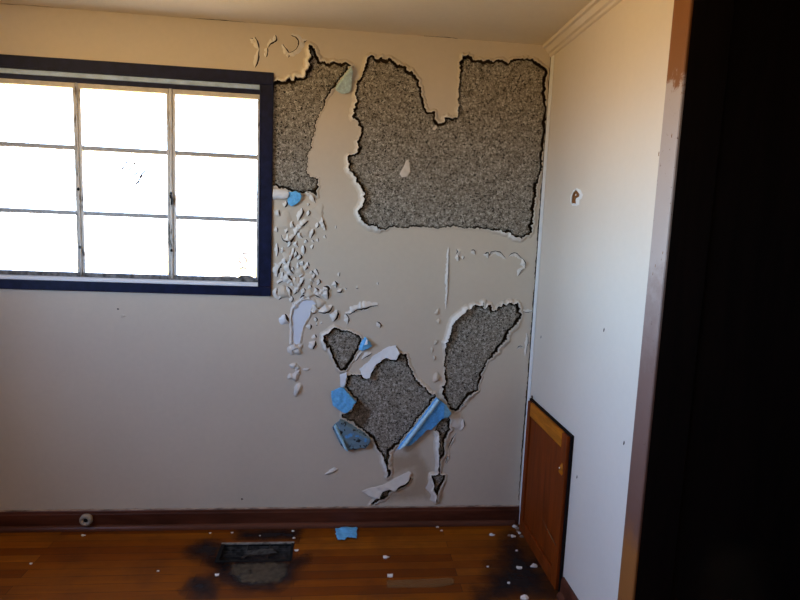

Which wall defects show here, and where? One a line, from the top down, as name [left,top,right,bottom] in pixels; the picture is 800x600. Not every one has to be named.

peeling [271,41,549,506]
spalling [570,188,583,206]